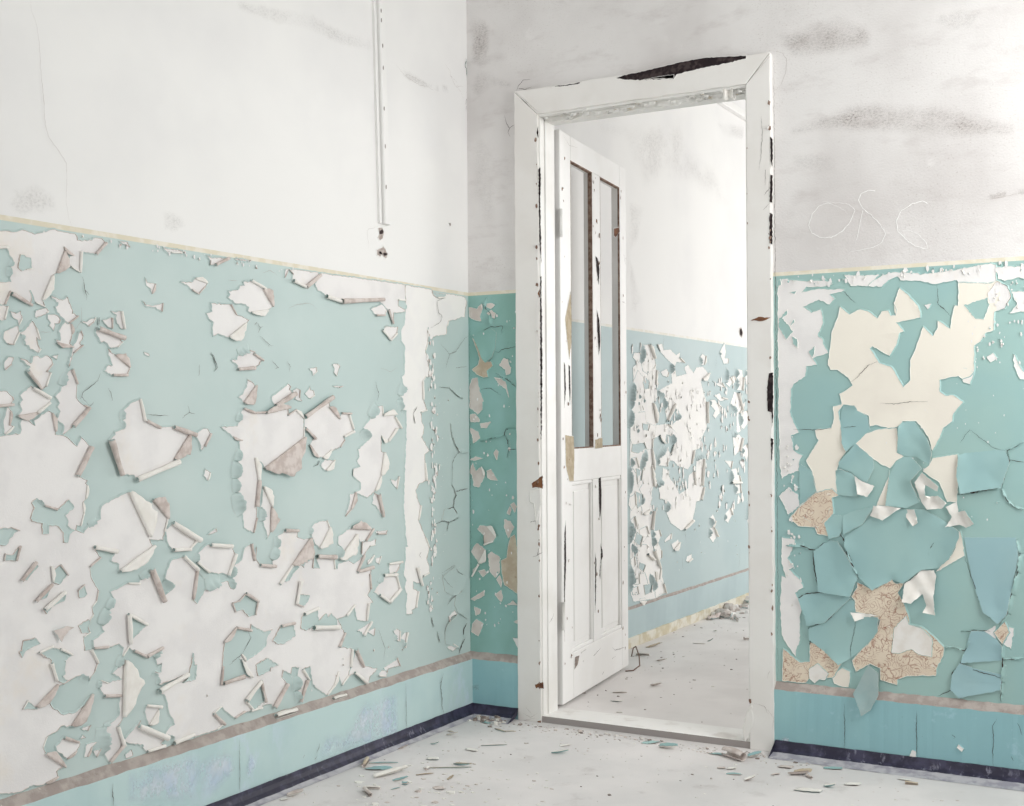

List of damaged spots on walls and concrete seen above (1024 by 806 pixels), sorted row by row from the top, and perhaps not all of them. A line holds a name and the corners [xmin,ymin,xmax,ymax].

peeling [616,55,747,81]
peeling [0,226,517,795]
crack [431,297,516,712]
peeling [623,343,750,605]
peeling [739,261,1024,716]